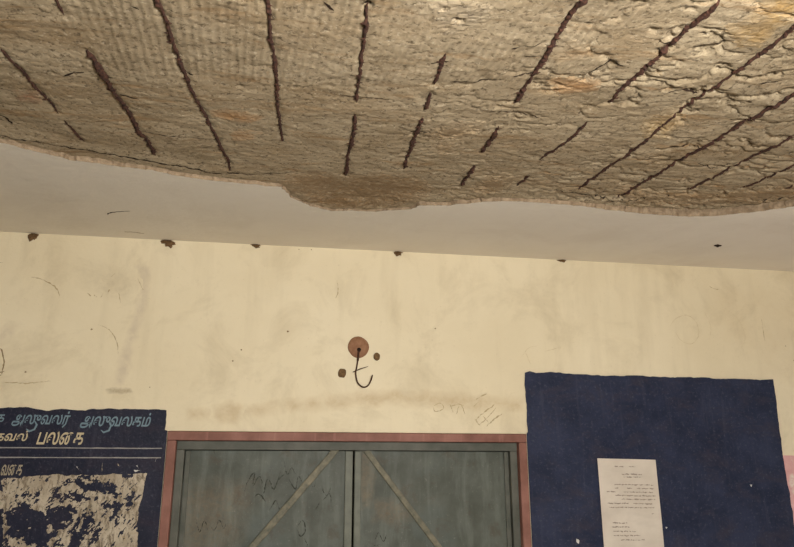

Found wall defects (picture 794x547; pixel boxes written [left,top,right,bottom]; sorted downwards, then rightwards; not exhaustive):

spalling [0,0,794,210]